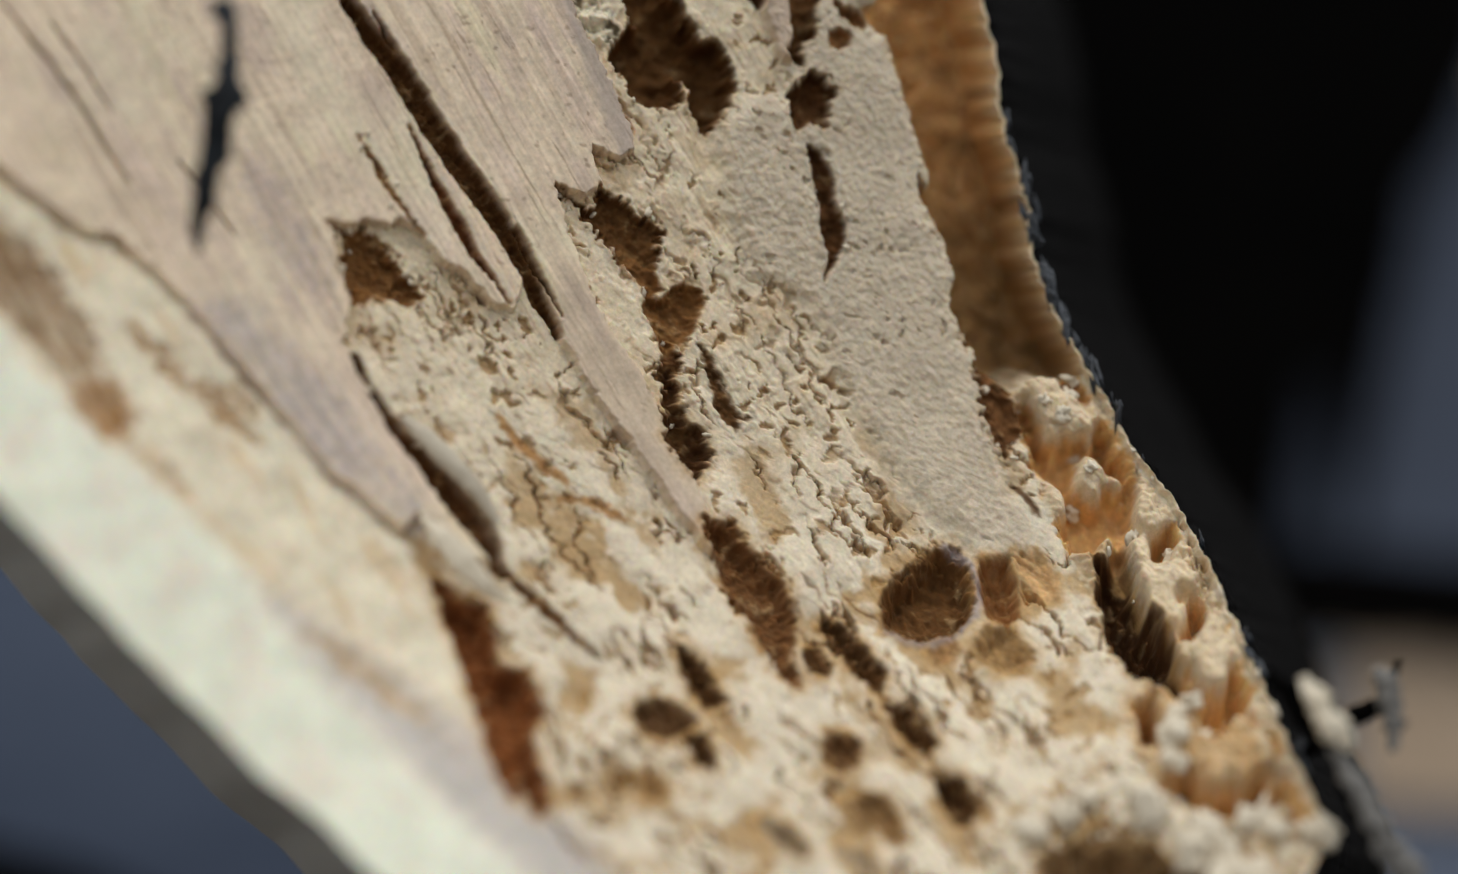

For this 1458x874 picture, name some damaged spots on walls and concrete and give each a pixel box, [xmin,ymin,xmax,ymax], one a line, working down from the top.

spalling [608,0,742,140]
spalling [785,0,871,135]
spalling [327,219,431,311]
crack [335,0,570,346]
spalling [554,181,667,274]
spalling [651,341,718,482]
spalling [962,335,1026,466]
spalling [432,582,553,818]
spalling [631,644,728,772]
spalling [701,520,980,828]
spalling [1093,546,1180,700]
spalling [1034,831,1176,874]